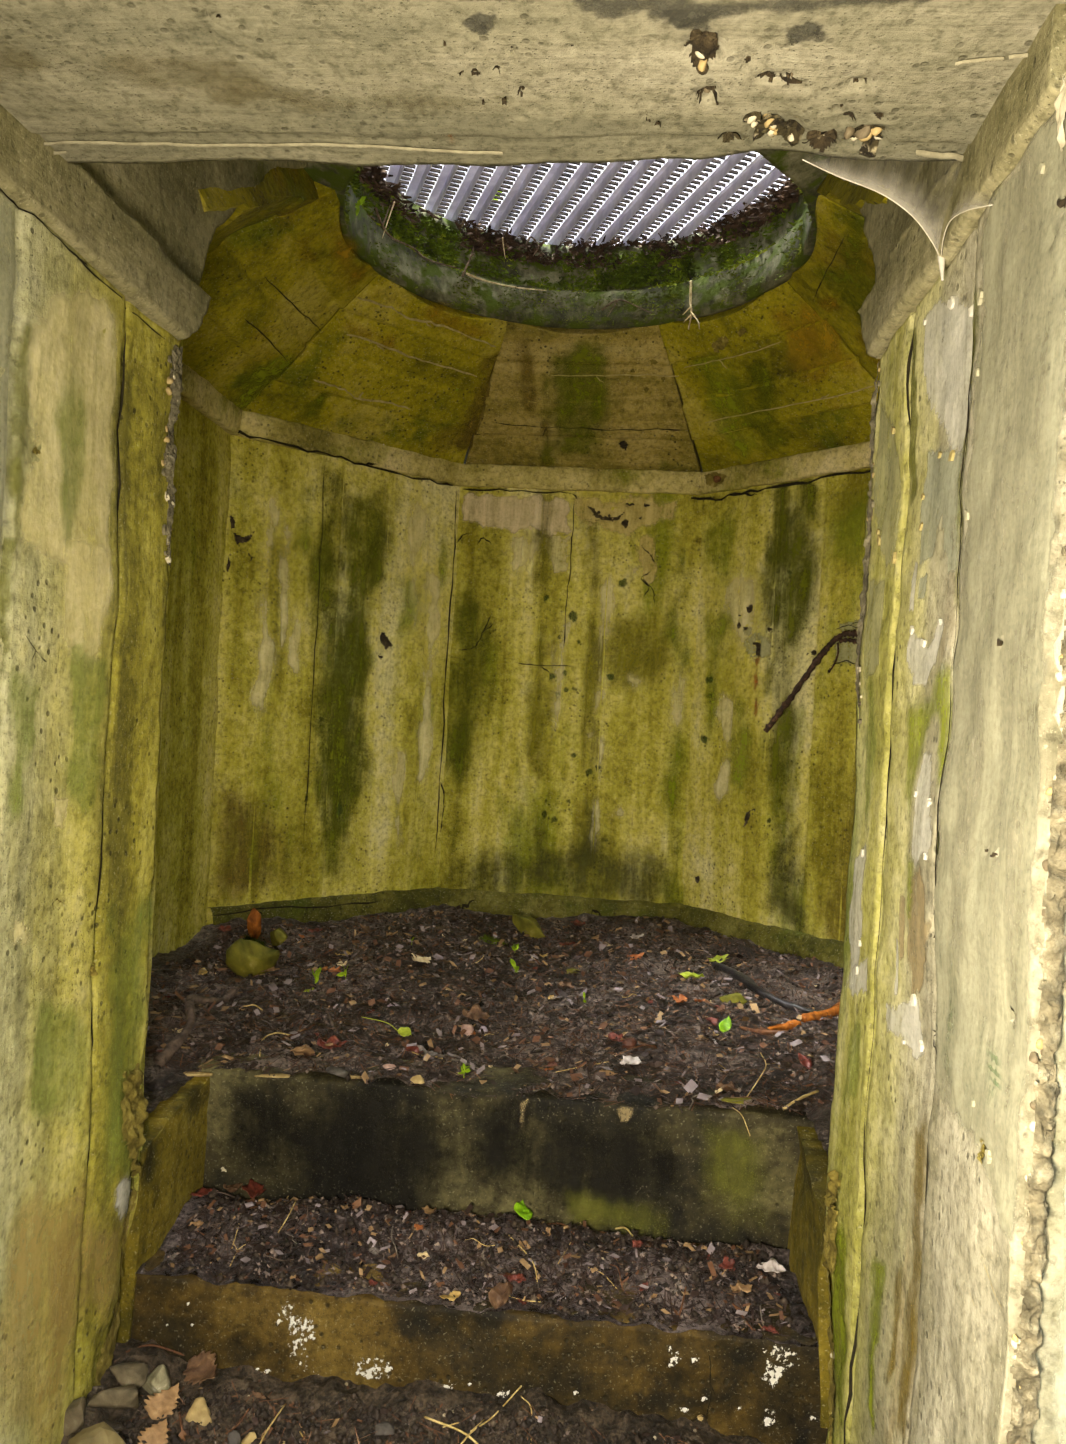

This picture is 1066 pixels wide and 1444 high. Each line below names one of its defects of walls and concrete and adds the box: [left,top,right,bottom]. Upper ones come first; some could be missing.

spalling [684,29,719,75]
spalling [718,104,885,158]
crack [495,336,913,448]
leakage [766,480,816,572]
crack [889,653,897,698]
peeling [886,76,1066,1444]
leakage [770,844,802,931]
peeling [849,848,867,995]
crack [863,739,891,1230]
leakage [276,1301,319,1375]
leakage [356,1358,392,1379]
crack [844,1310,859,1444]